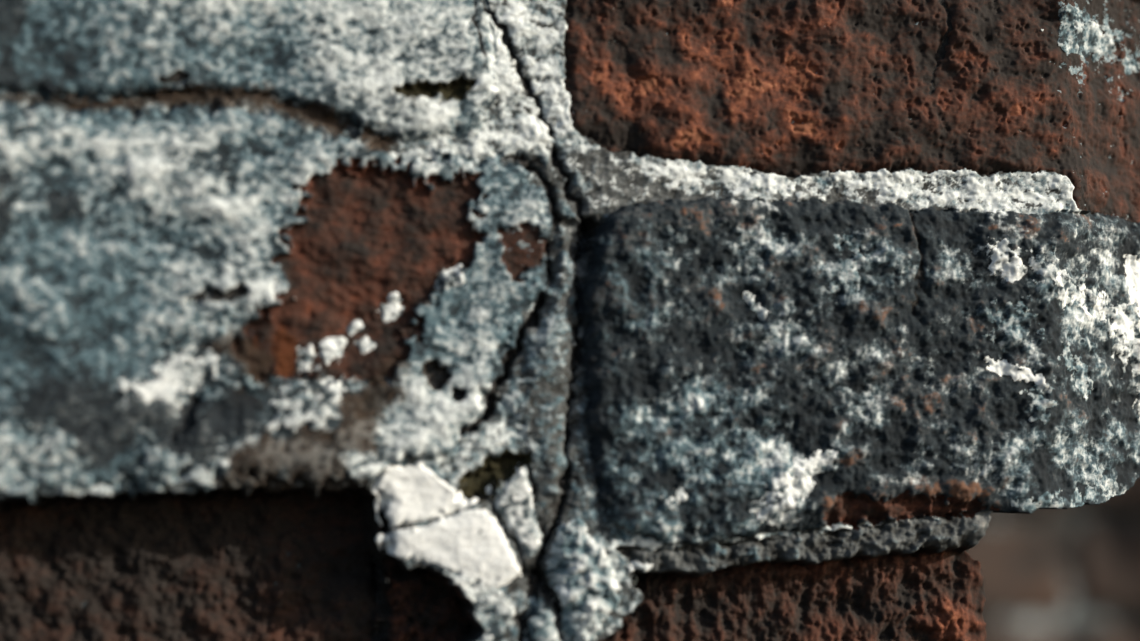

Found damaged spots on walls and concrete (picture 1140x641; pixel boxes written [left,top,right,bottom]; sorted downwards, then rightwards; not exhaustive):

water stain [0,0,76,97]
water stain [0,168,21,246]
water stain [43,192,87,221]
water stain [12,328,411,507]
spalling [116,156,548,433]
crack [430,0,596,641]
water stain [567,237,613,442]
water stain [585,456,614,540]